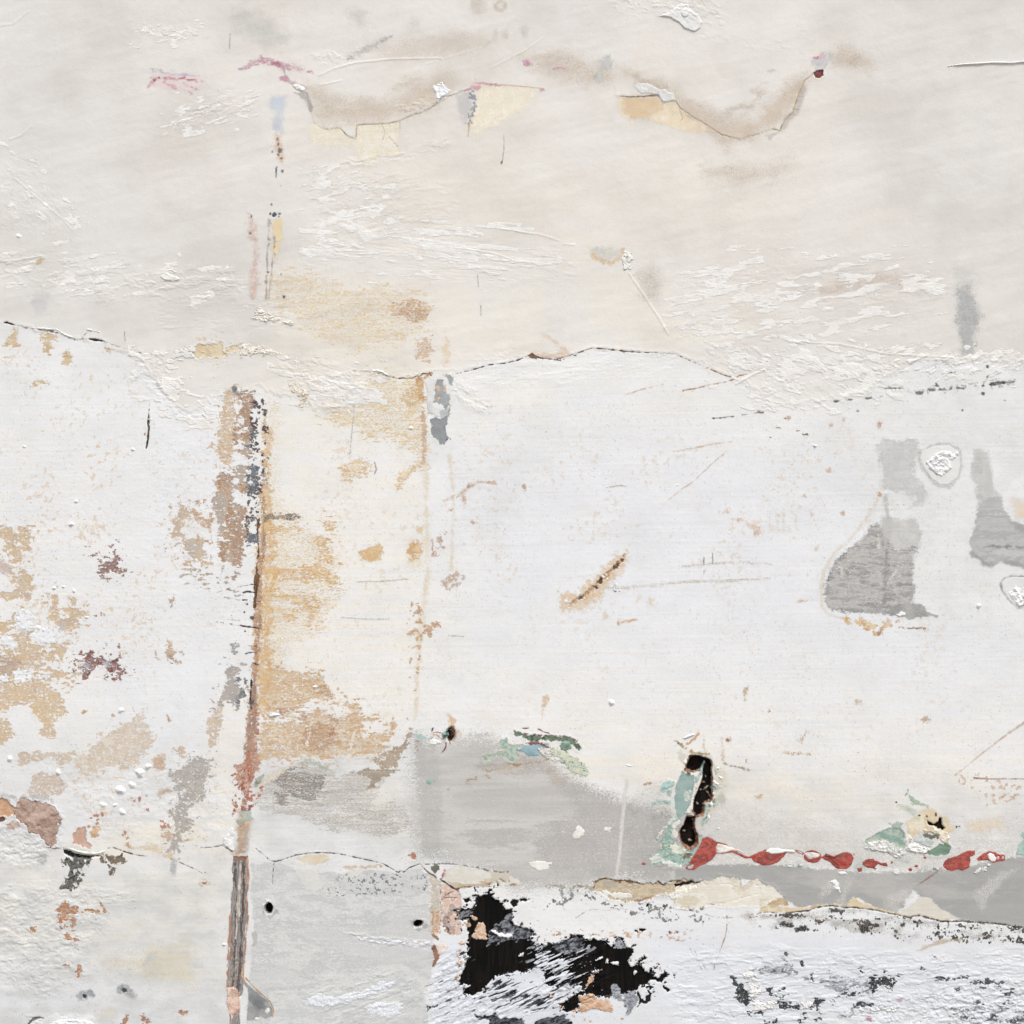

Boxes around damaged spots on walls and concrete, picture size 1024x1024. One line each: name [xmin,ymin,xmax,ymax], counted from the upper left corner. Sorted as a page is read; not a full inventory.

crack [5,321,152,355]
crack [362,333,746,392]
leakage [819,422,939,620]
leakage [969,448,1024,569]
rust [230,395,303,856]
rust [557,549,638,626]
peeling [0,328,1024,1024]
crack [47,847,144,859]
crack [171,845,498,922]